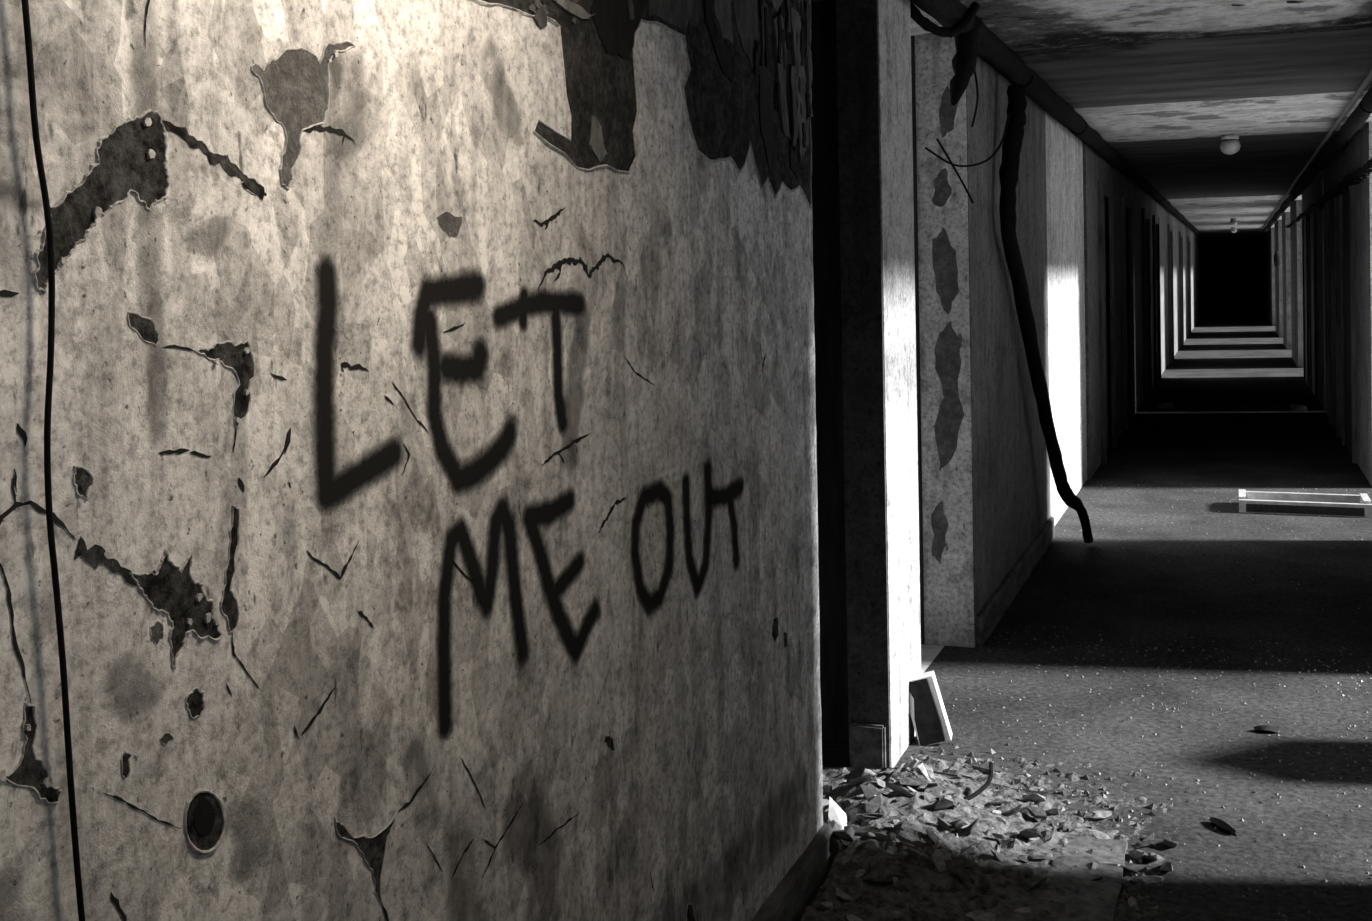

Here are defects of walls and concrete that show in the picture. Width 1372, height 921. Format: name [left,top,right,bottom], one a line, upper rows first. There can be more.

peeling [468,0,813,210]
peeling [938,85,959,139]
peeling [931,166,954,209]
spalling [436,211,462,238]
crack [163,344,193,352]
peeling [930,226,965,474]
peeling [930,499,950,564]